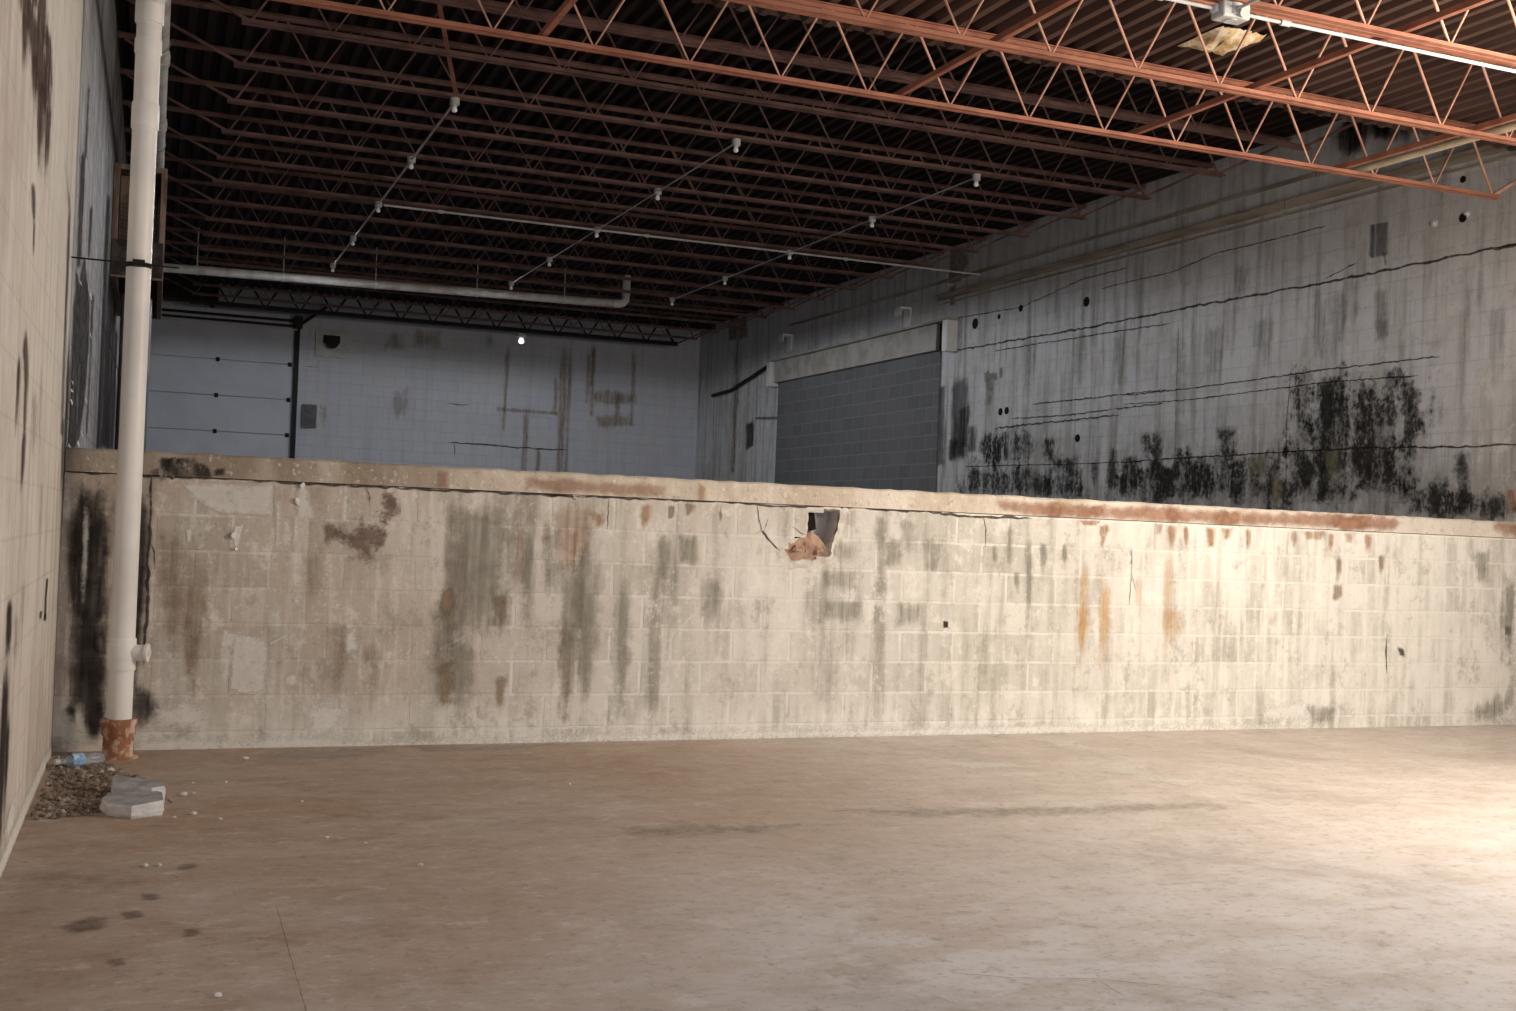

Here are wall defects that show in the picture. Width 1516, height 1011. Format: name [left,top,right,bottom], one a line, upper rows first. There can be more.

damp [23,0,53,164]
damp [960,368,1516,519]
damp [135,504,148,645]
damp [436,512,505,704]
damp [524,537,551,585]
spalling [775,507,849,570]
damp [994,530,1067,599]
rust [1079,592,1108,641]
rust [1001,502,1398,547]
damp [1506,580,1516,670]
damp [133,689,1332,757]
damp [0,707,103,876]